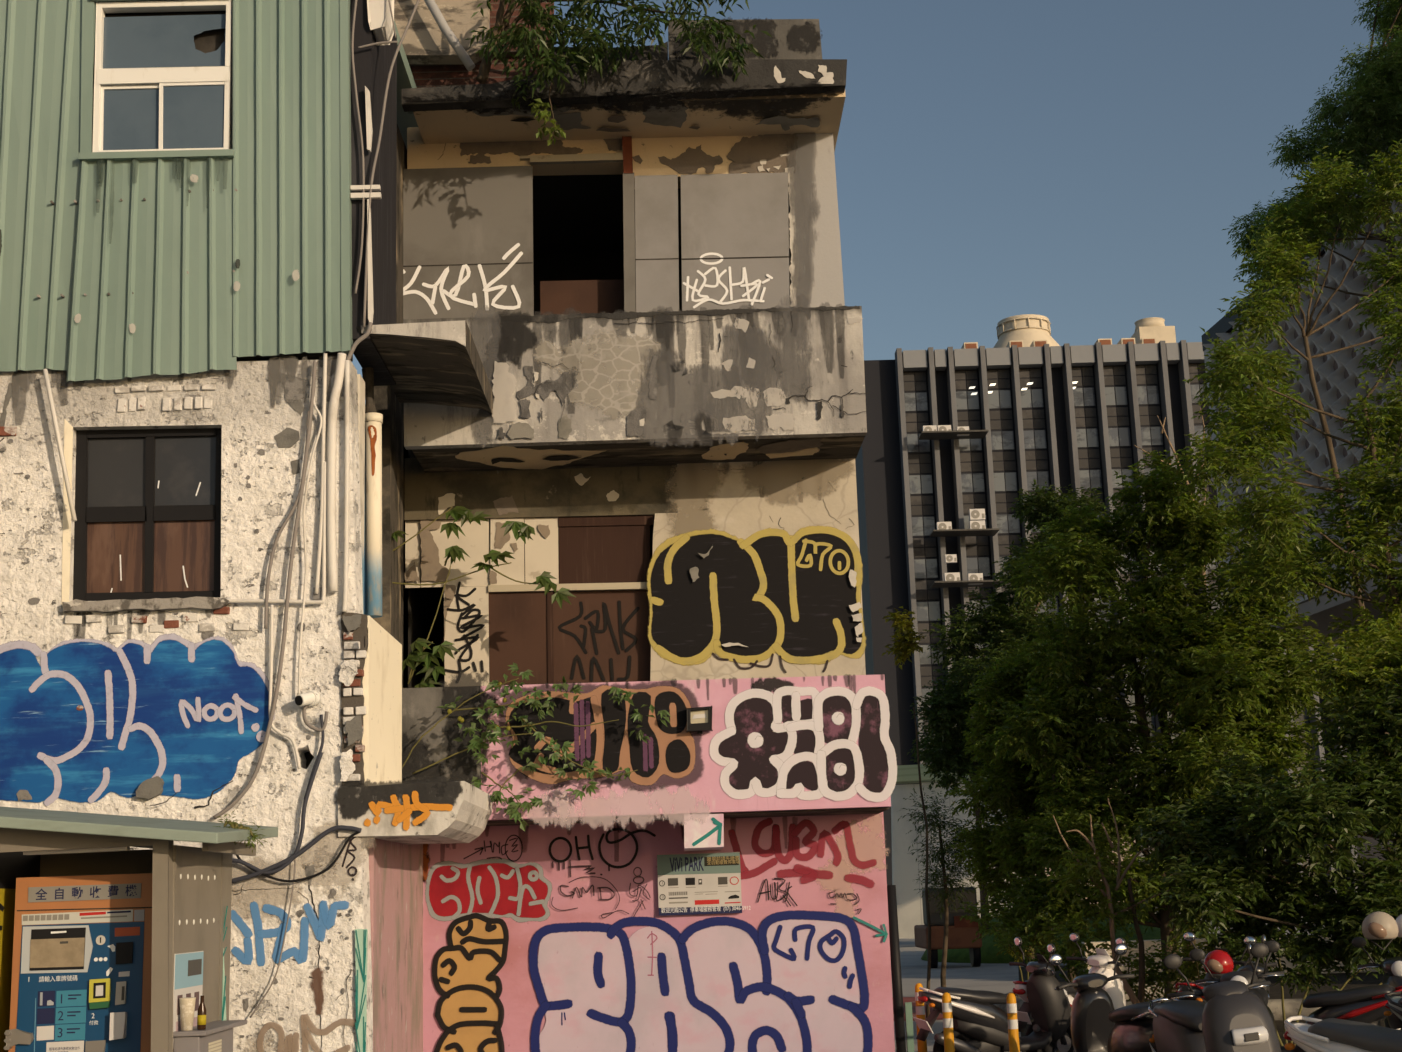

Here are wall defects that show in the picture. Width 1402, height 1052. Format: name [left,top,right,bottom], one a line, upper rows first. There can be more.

damp [402,81,842,123]
peeling [460,95,820,304]
damp [637,132,820,447]
peeling [734,319,749,333]
damp [12,370,85,425]
flaking render [115,384,216,412]
damp [268,355,336,407]
damp [470,306,537,447]
peeling [455,361,605,486]
spalling [701,358,823,460]
crack [774,365,869,417]
flaking render [64,606,249,640]